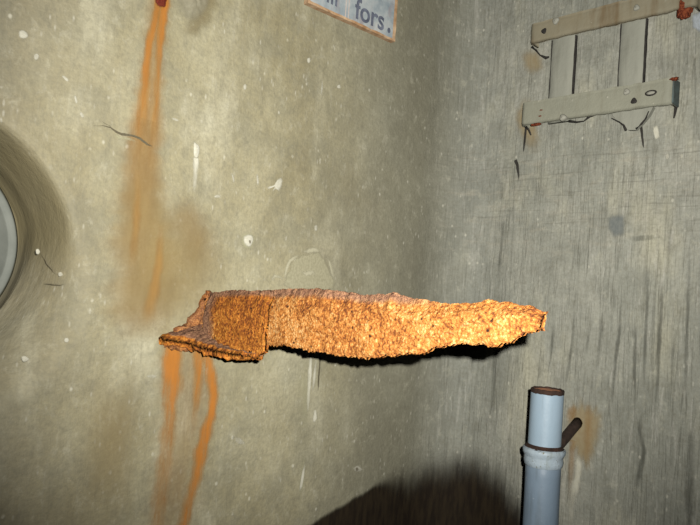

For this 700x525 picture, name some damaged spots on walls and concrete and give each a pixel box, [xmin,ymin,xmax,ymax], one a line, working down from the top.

corrosion [676,0,694,20]
corrosion [141,0,169,111]
crack [105,126,151,146]
corrosion [202,290,275,355]
corrosion [163,347,181,431]
corrosion [183,351,217,525]